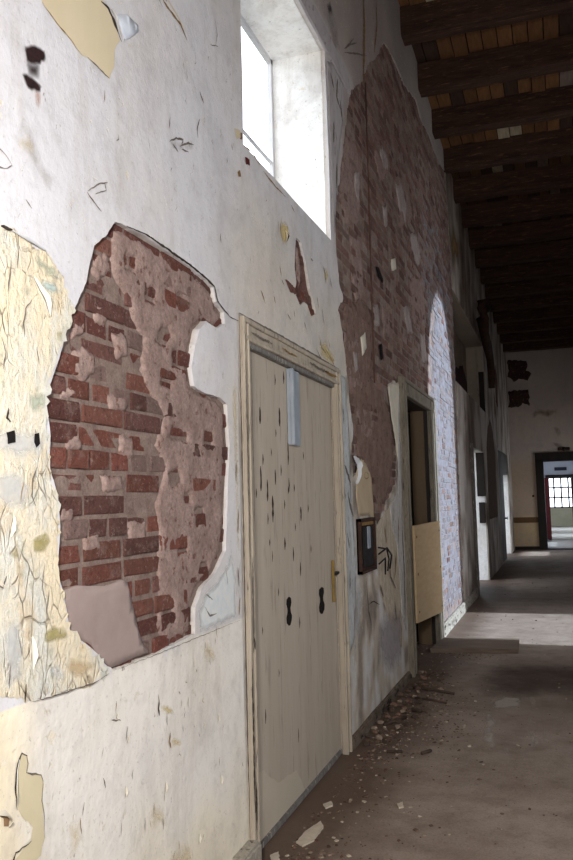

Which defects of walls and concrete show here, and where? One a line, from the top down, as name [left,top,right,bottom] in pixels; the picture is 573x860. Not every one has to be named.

peeling [42,0,138,79]
flaking render [278,219,324,327]
flaking render [323,0,469,652]
spalling [495,360,531,408]
spalling [0,224,240,703]
peeling [0,753,45,860]